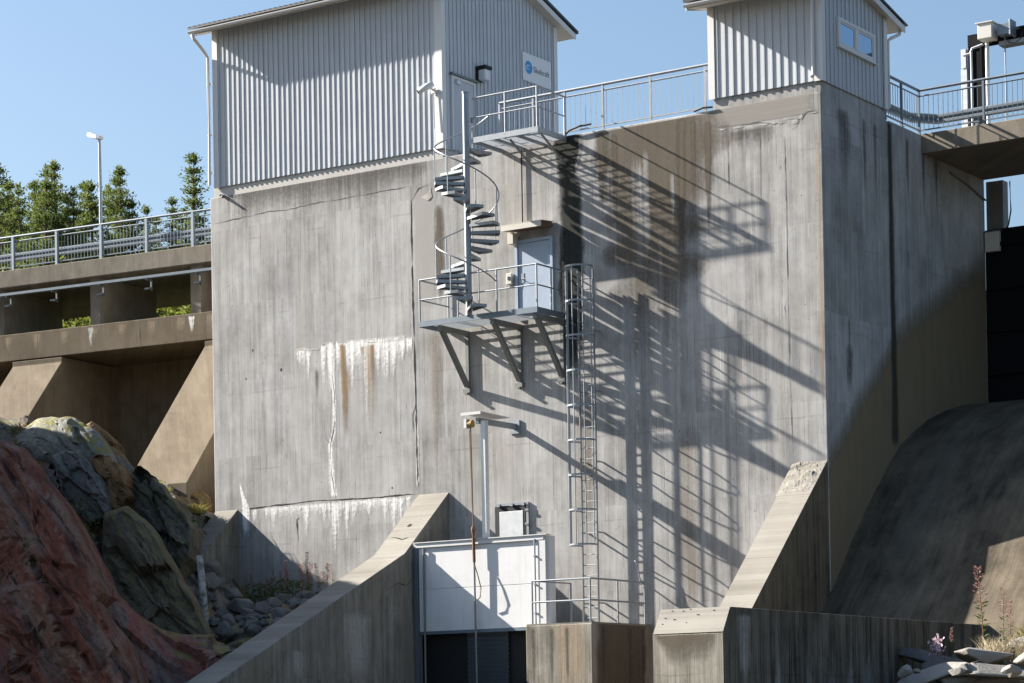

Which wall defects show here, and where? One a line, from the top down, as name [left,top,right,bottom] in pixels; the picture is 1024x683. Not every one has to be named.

crack [215,185,426,534]
leakage [295,336,412,405]
leakage [240,484,411,538]
spalling [776,462,825,496]